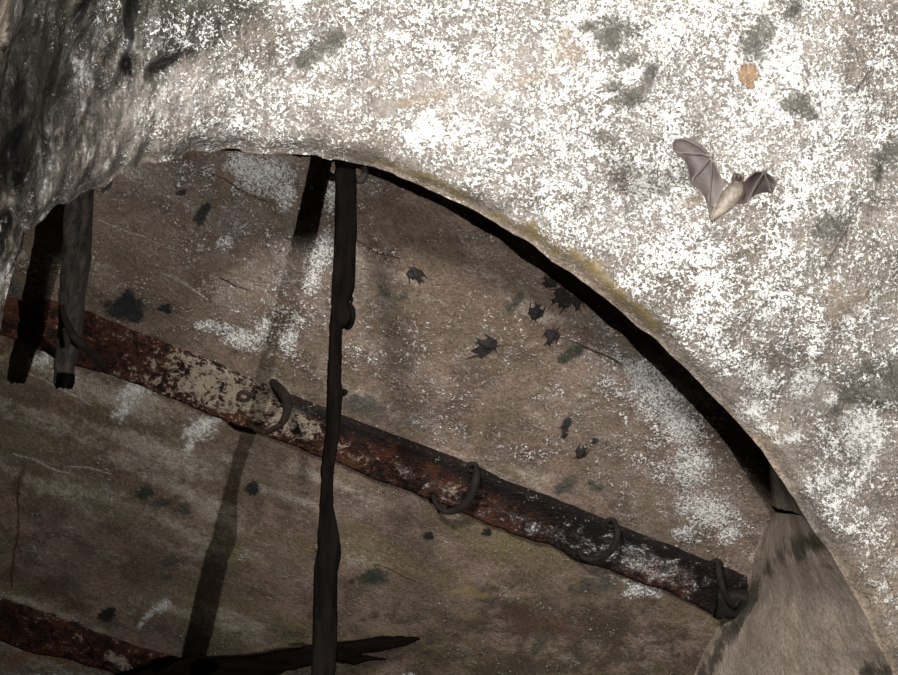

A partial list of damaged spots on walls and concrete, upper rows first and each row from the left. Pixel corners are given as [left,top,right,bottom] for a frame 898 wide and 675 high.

rust [737,63,759,90]
crack [205,171,268,202]
crack [820,202,862,275]
crack [570,340,623,365]
damp [732,359,806,446]
damp [623,357,744,546]